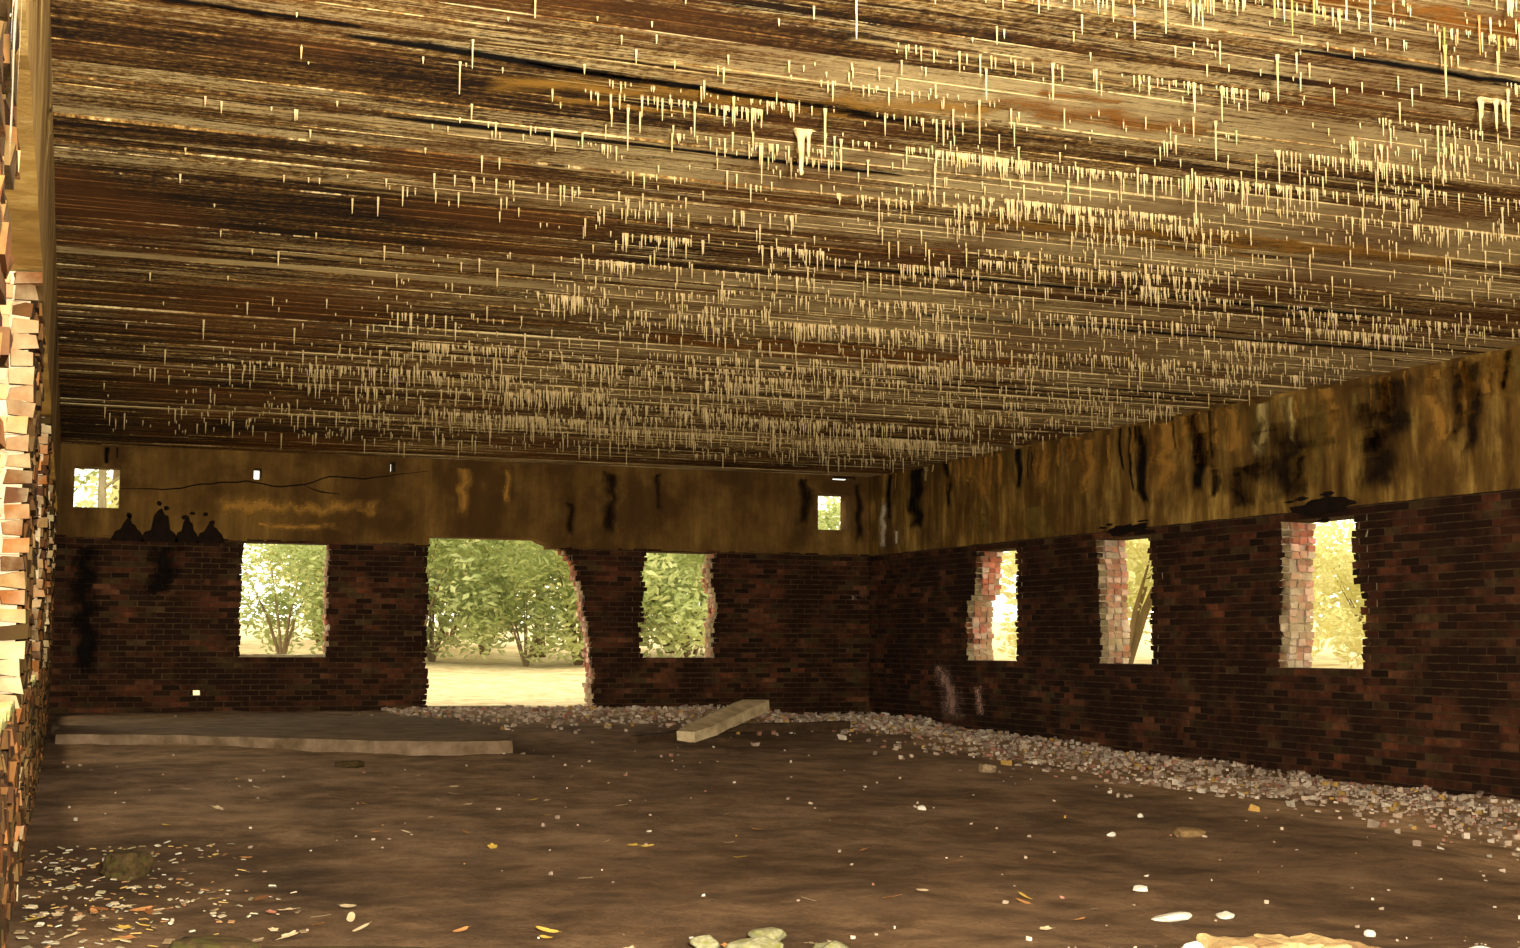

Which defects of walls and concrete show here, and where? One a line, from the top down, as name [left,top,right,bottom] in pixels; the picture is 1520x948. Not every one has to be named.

leakage [104,0,1520,545]
corrosion [1301,0,1520,42]